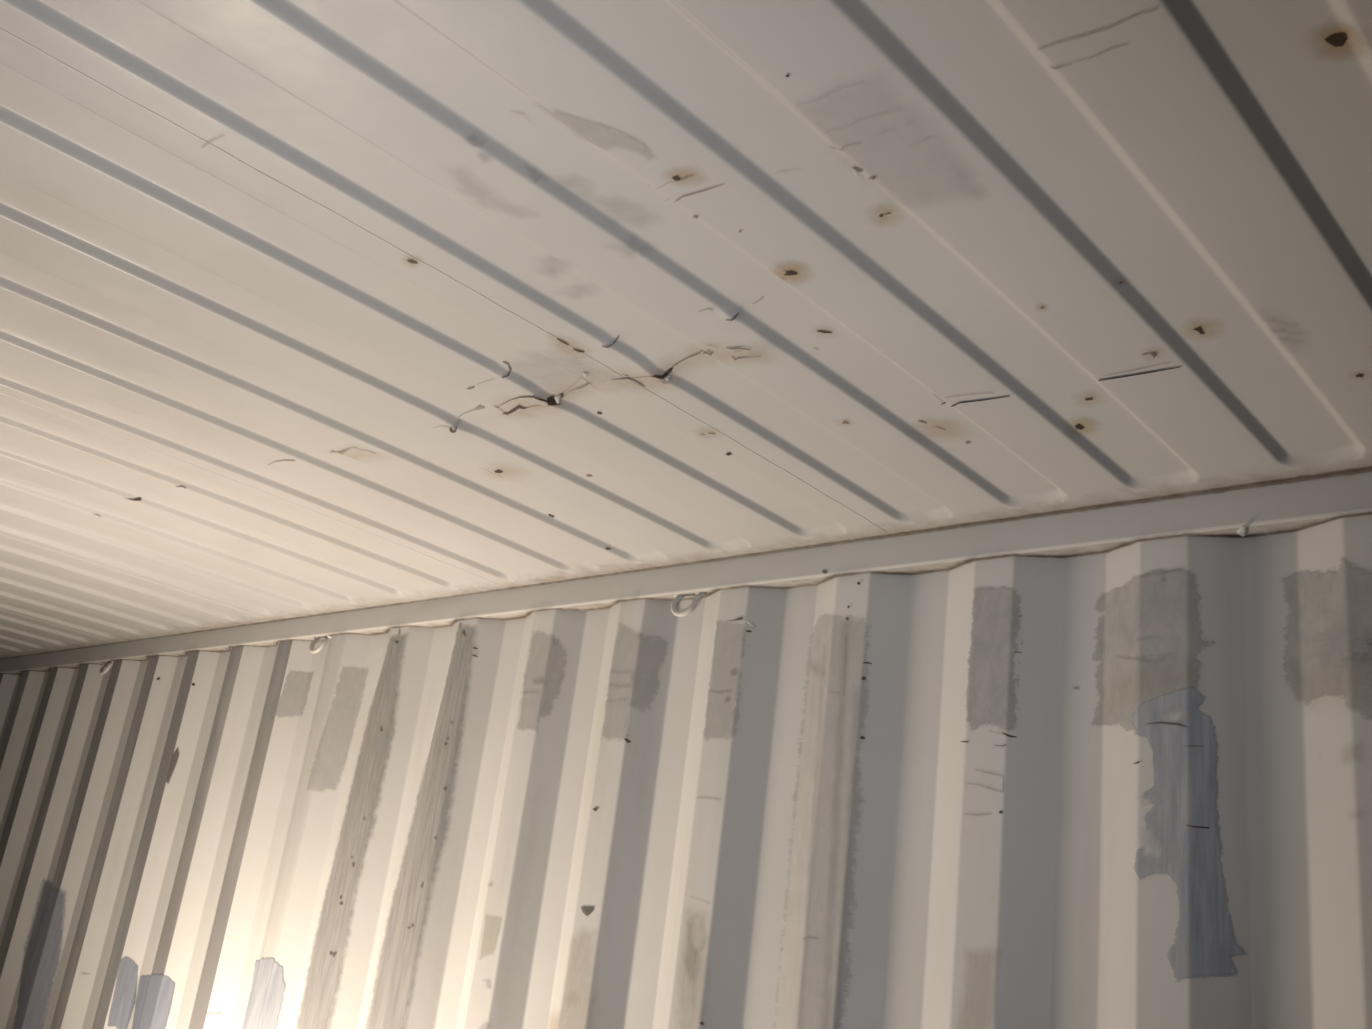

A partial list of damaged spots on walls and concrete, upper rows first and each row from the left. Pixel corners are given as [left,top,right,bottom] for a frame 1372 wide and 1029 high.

corrosion [1324,29,1348,47]
crack [435,345,759,433]